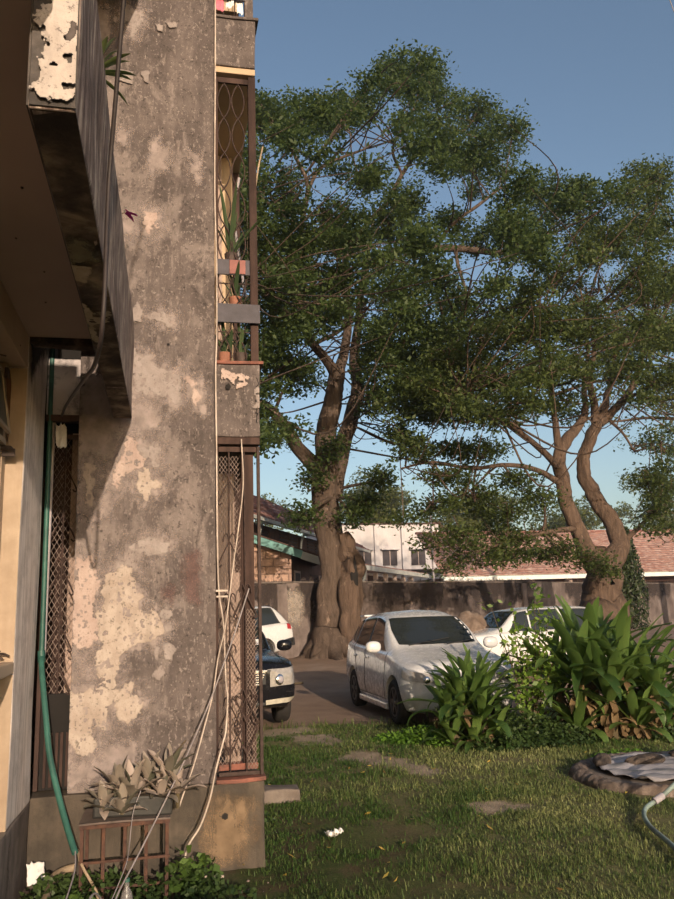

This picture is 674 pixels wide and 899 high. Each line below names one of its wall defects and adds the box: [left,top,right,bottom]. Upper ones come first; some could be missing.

peeling [29,0,78,101]